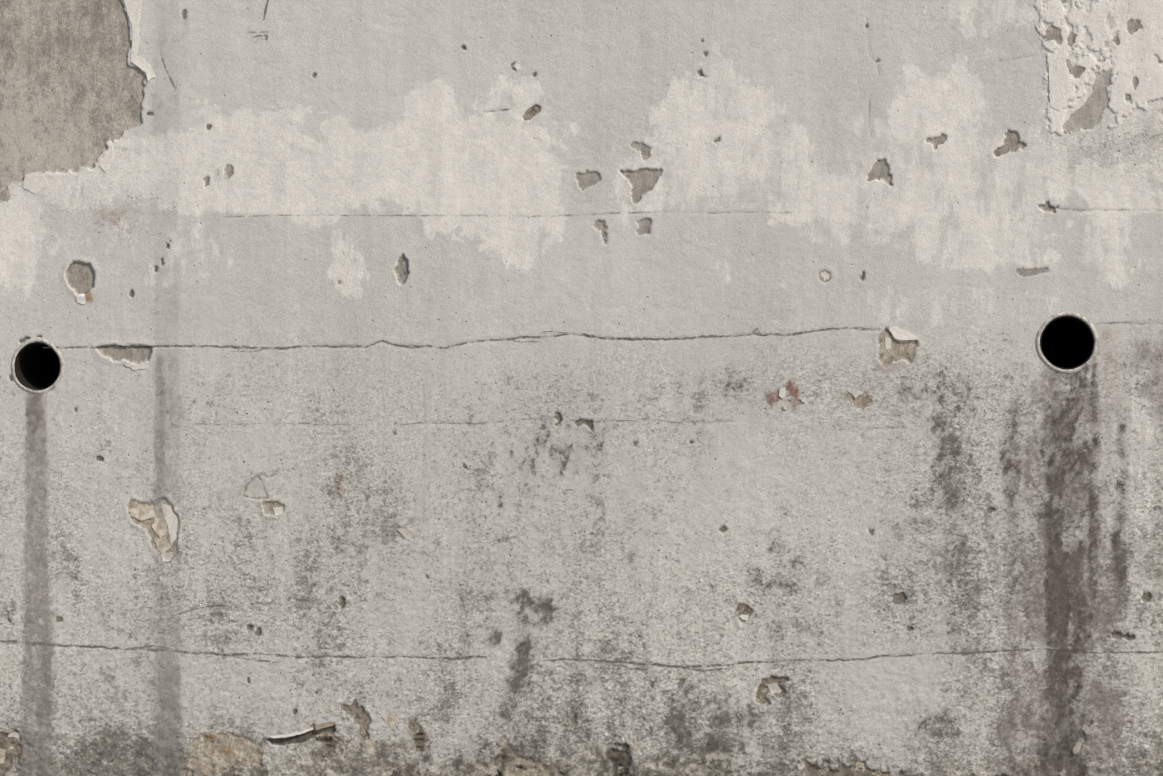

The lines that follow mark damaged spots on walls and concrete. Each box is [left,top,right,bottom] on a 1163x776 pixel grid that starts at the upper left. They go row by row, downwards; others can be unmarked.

crack [247,0,269,43]
peeling [0,0,156,202]
peeling [1043,26,1112,148]
peeling [620,142,662,204]
crack [43,326,874,352]
water stain [21,390,64,776]
water stain [997,363,1131,776]
crack [0,636,487,662]
water stain [476,578,773,776]
crack [549,648,1162,671]
peeling [187,722,339,776]
water stain [909,710,964,744]